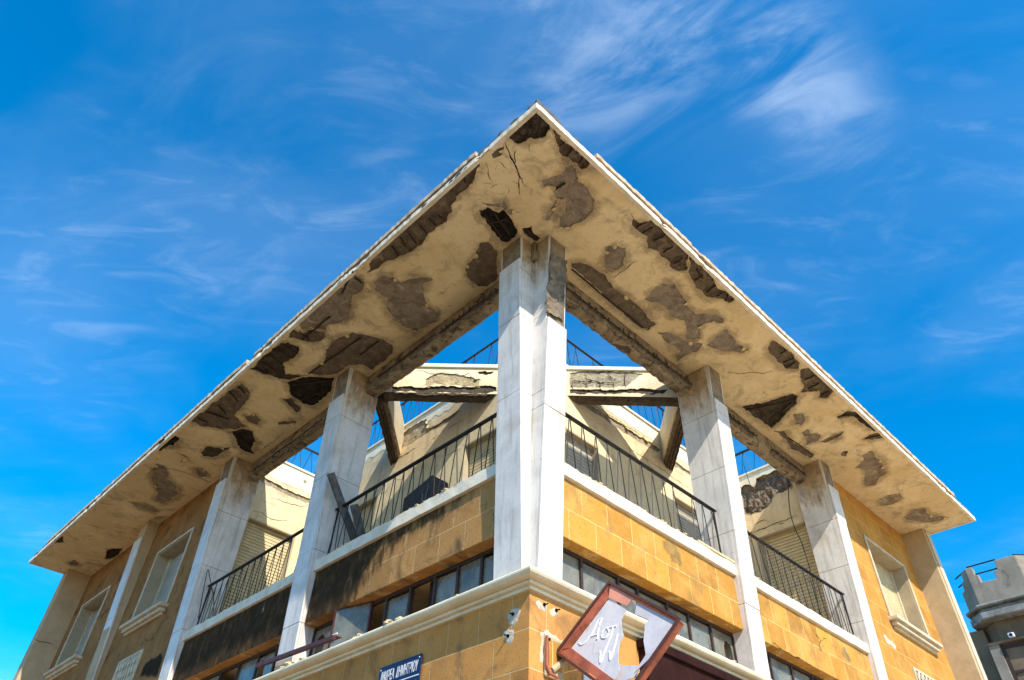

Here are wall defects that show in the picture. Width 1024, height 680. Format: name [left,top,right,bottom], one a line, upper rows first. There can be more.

crack [486,142,532,194]
spalling [632,218,734,302]
flaking render [192,113,595,503]
flaking render [545,245,749,389]
flaking render [129,464,178,512]
flaking render [569,371,668,452]
spalling [728,340,844,515]
flaking render [837,411,887,486]